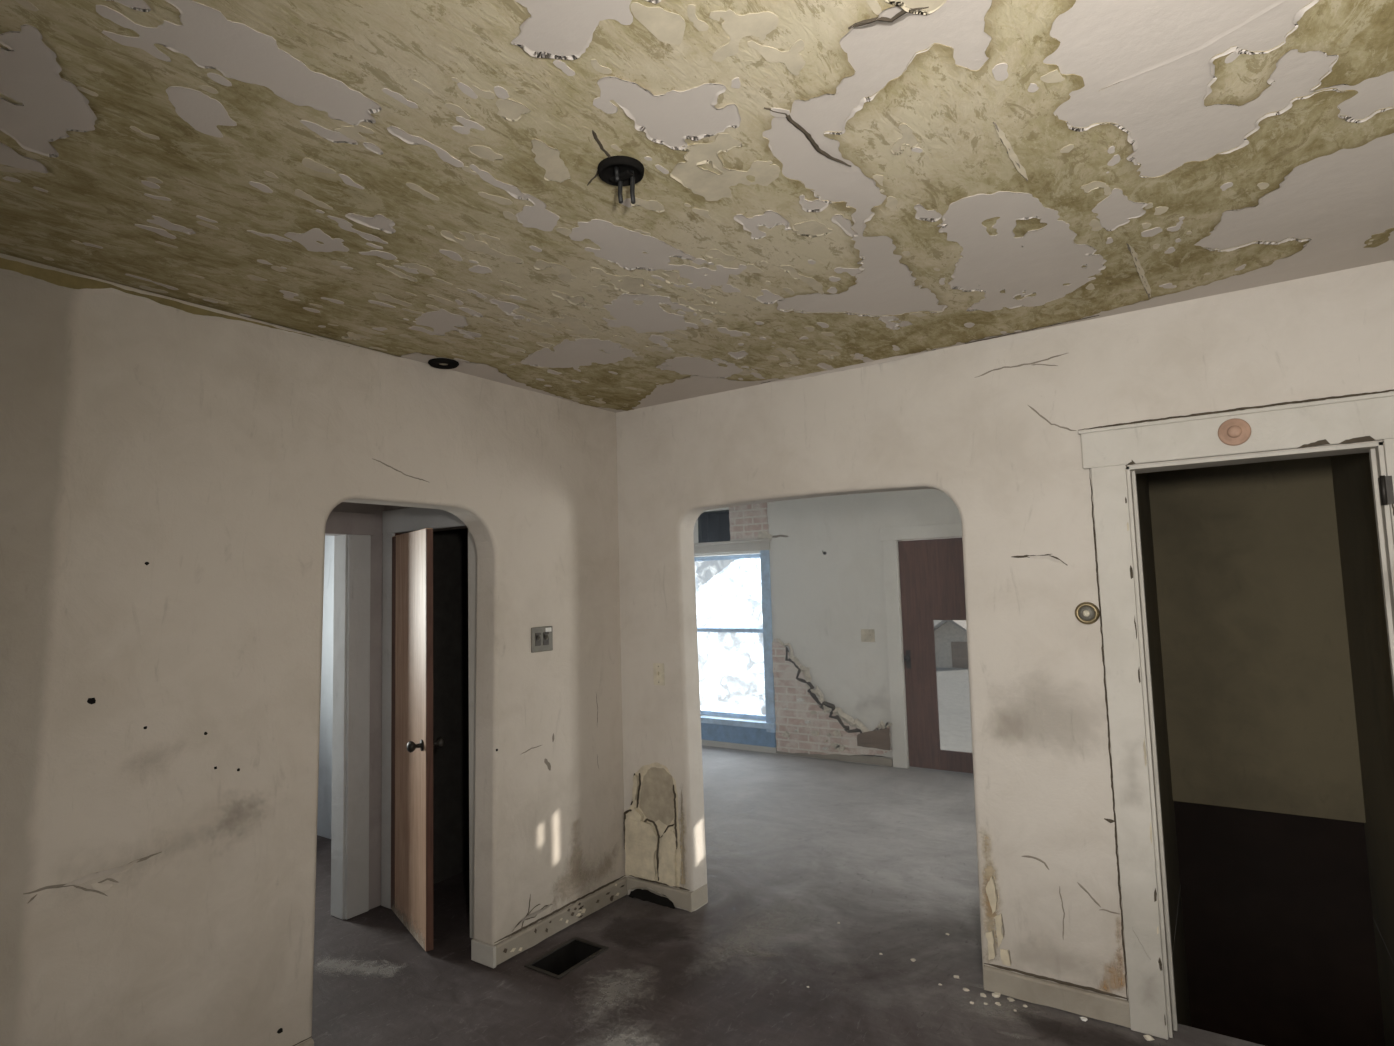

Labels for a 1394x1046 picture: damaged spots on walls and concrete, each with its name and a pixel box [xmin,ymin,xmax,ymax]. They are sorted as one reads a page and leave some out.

peeling [0,0,1394,411]
crack [764,107,851,167]
spalling [534,762,681,933]
peeling [985,876,1011,966]